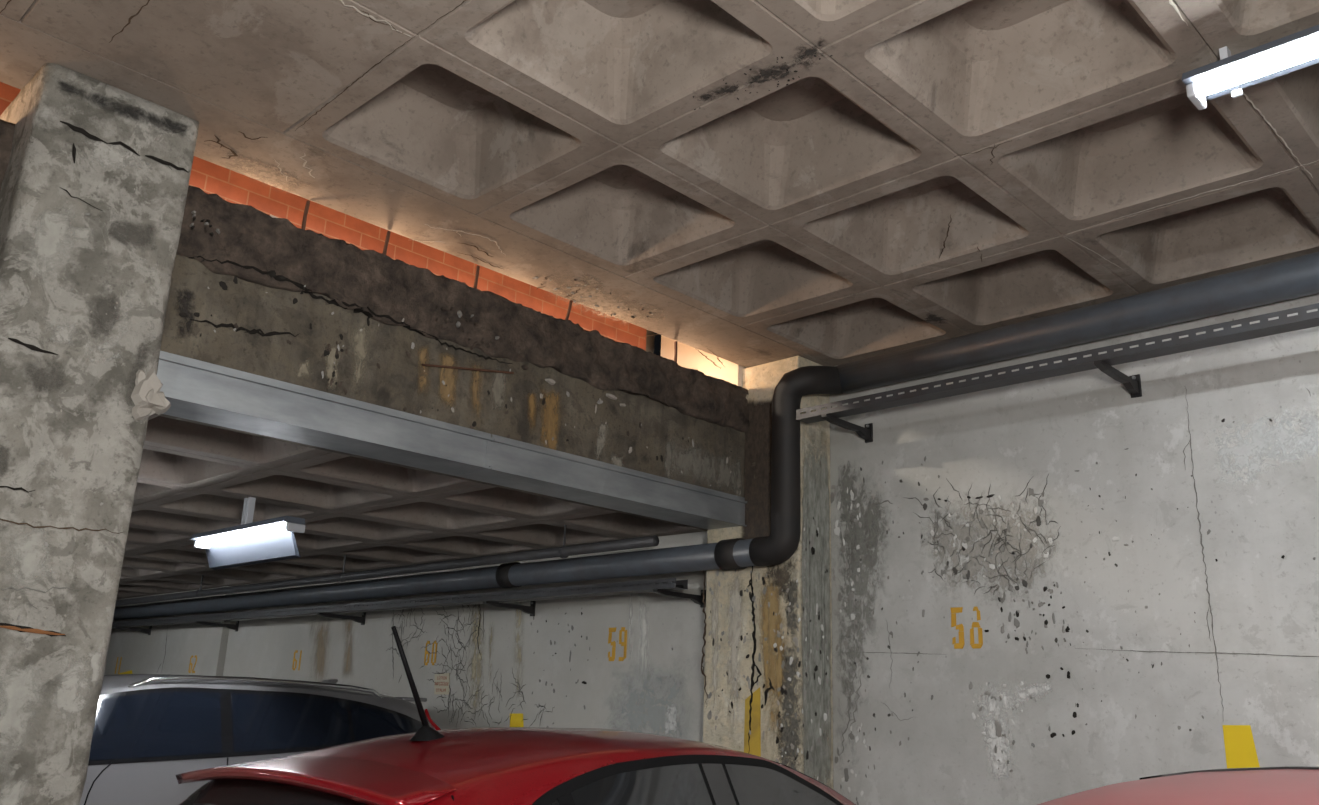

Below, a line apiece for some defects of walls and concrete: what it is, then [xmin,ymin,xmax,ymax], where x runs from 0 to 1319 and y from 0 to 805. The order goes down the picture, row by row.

crack [109,0,150,43]
crack [207,0,466,181]
crack [60,121,188,211]
crack [188,256,513,364]
corrosion [419,348,456,404]
corrosion [529,392,559,450]
crack [866,474,1061,595]
corrosion [0,623,66,636]
crack [386,592,554,727]
crack [747,566,775,751]
damp [767,454,887,787]